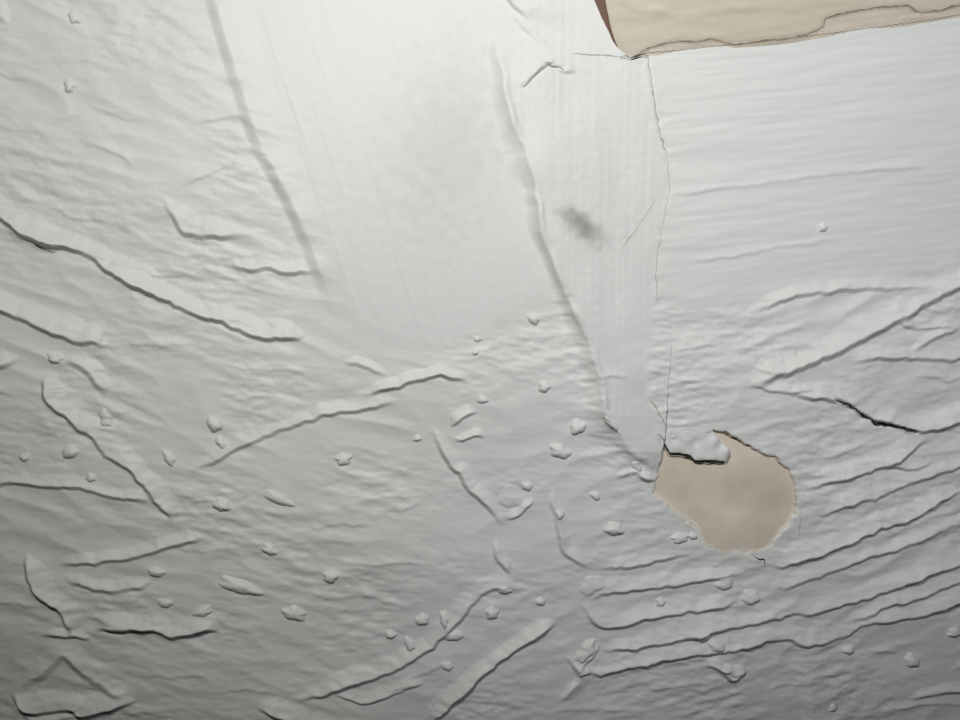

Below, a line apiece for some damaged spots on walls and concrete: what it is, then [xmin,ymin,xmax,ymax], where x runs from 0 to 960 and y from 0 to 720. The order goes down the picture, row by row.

peeling [796,6,960,38]
peeling [641,40,730,53]
crack [838,400,917,432]
peeling [649,419,797,554]